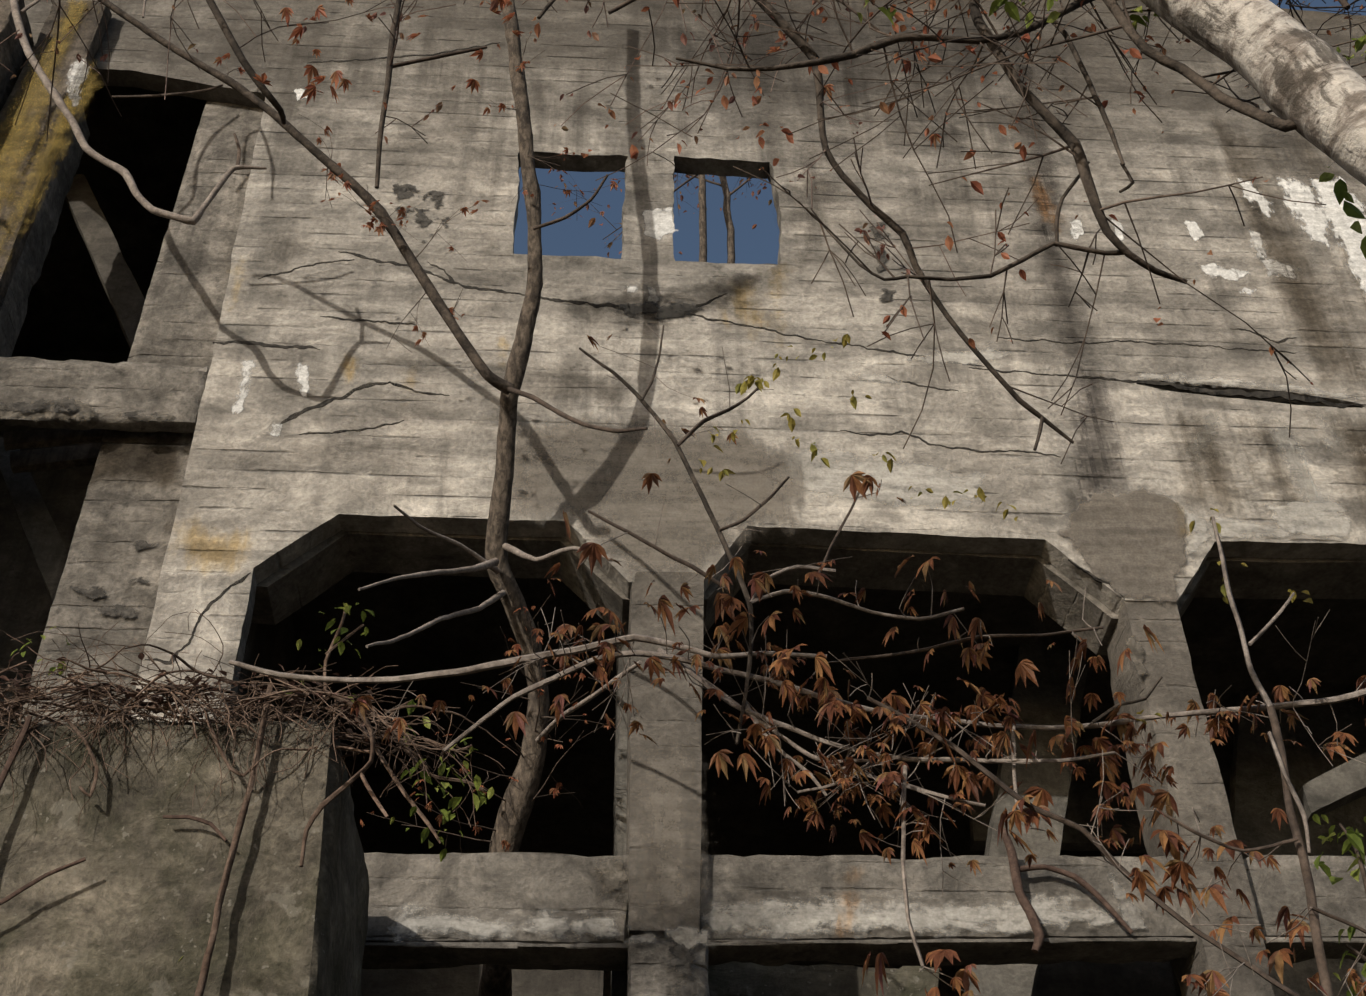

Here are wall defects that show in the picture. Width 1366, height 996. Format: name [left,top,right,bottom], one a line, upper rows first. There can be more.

water stain [0,2,92,216]
water stain [1069,220,1084,239]
water stain [1111,219,1124,240]
water stain [1184,221,1204,241]
water stain [1238,176,1366,292]
crack [259,251,624,311]
water stain [1201,263,1256,295]
crack [691,293,1366,408]
crack [282,381,449,435]